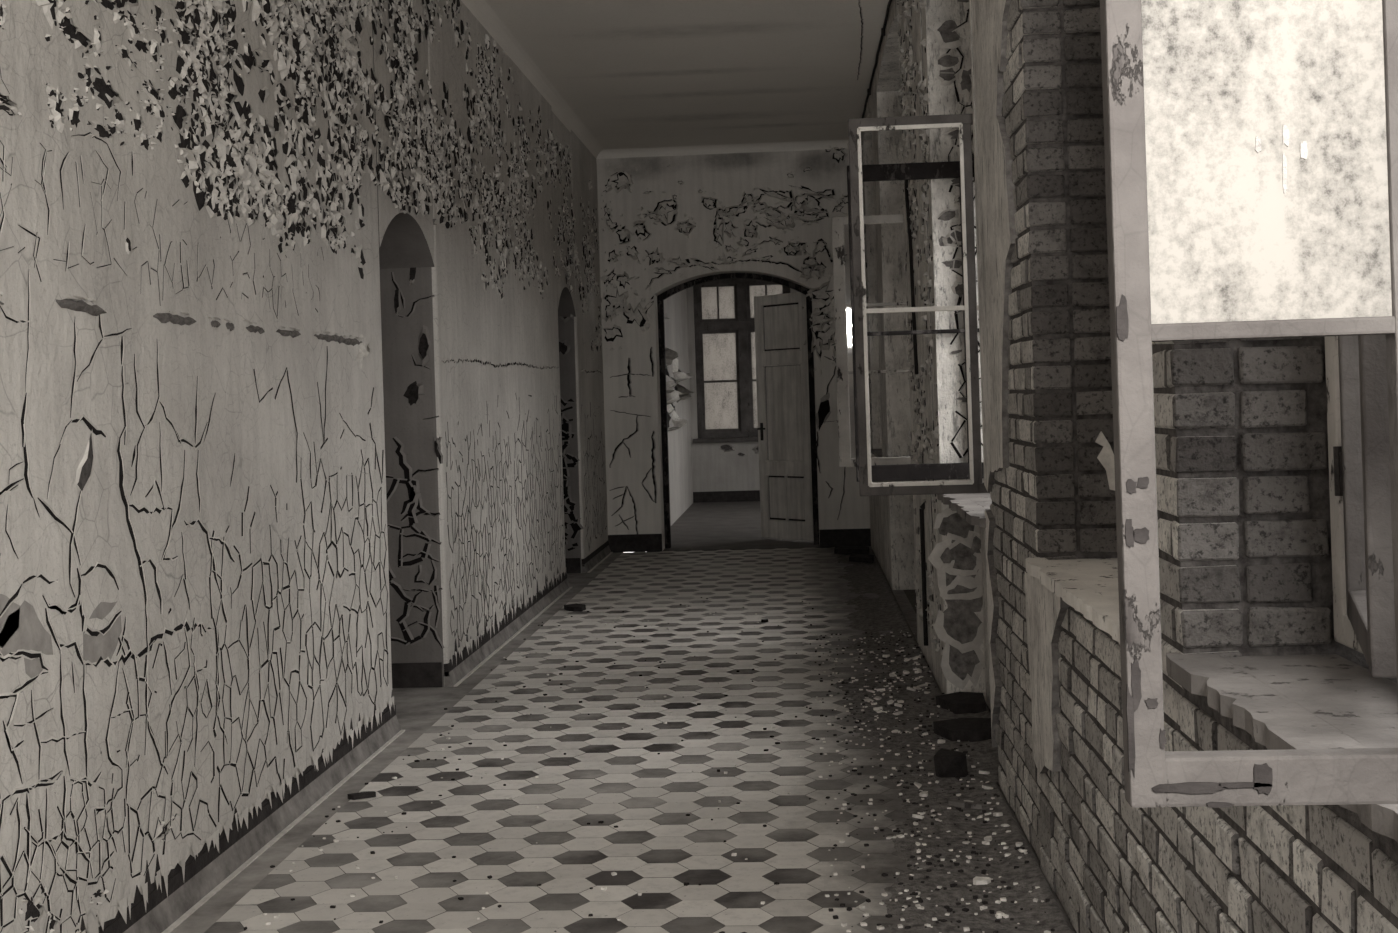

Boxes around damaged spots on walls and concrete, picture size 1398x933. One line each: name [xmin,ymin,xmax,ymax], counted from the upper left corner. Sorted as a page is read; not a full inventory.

peeling [0,94,23,117]
peeling [36,0,869,376]
spalling [988,0,1018,492]
peeling [403,325,431,406]
peeling [665,346,694,432]
spalling [816,393,832,430]
peeling [839,0,1003,747]
crack [0,132,657,933]
peeling [0,594,53,678]
spalling [1040,597,1070,773]